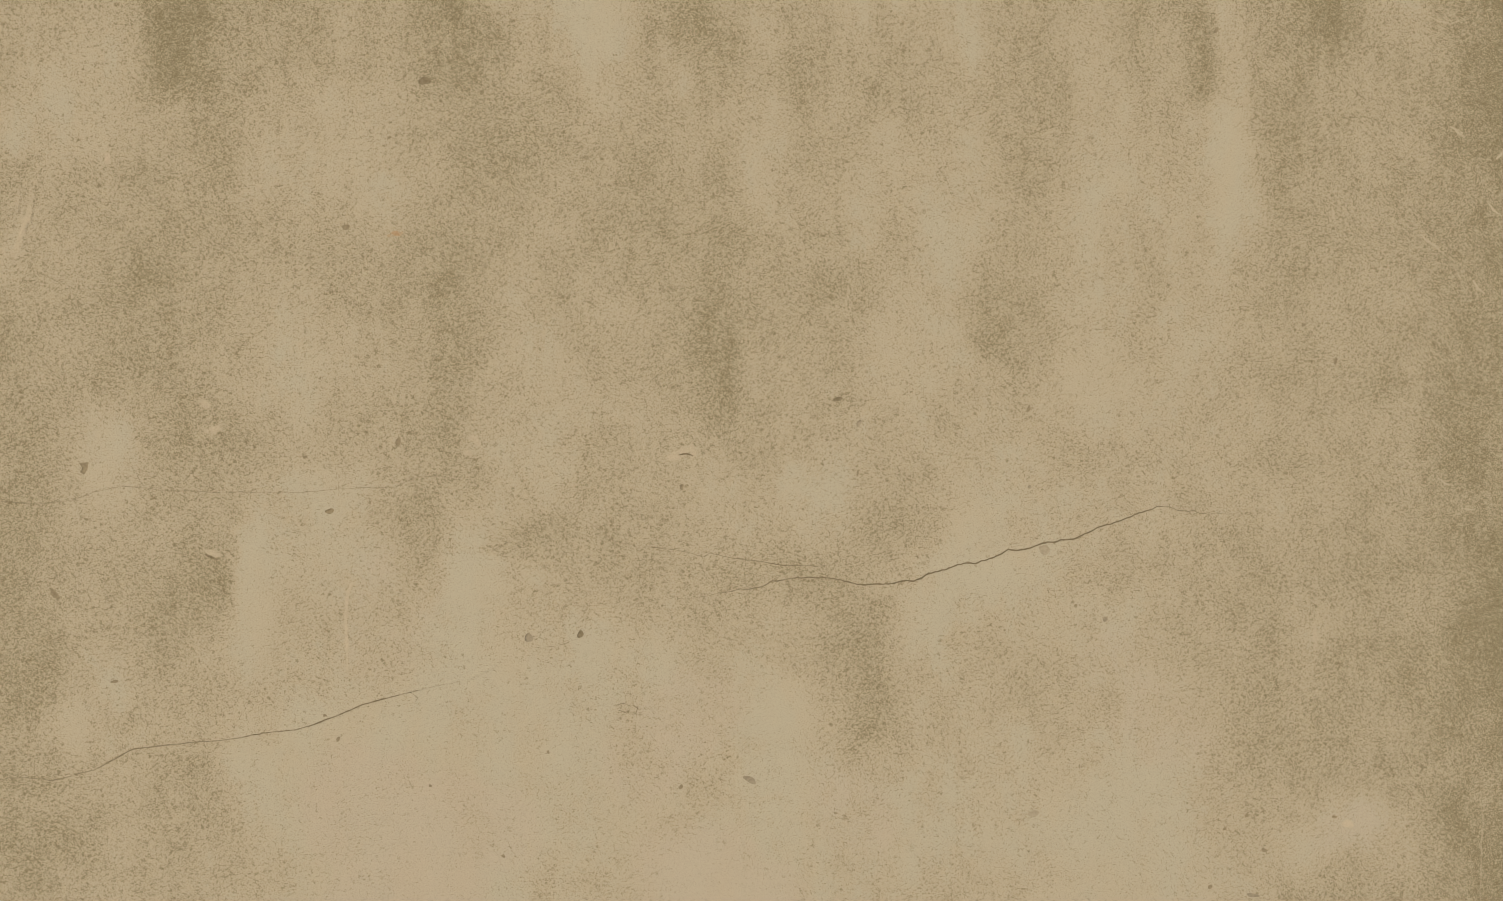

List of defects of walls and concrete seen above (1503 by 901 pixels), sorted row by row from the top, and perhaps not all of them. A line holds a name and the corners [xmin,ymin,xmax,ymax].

crack [0,460,1325,607]
crack [0,662,501,781]